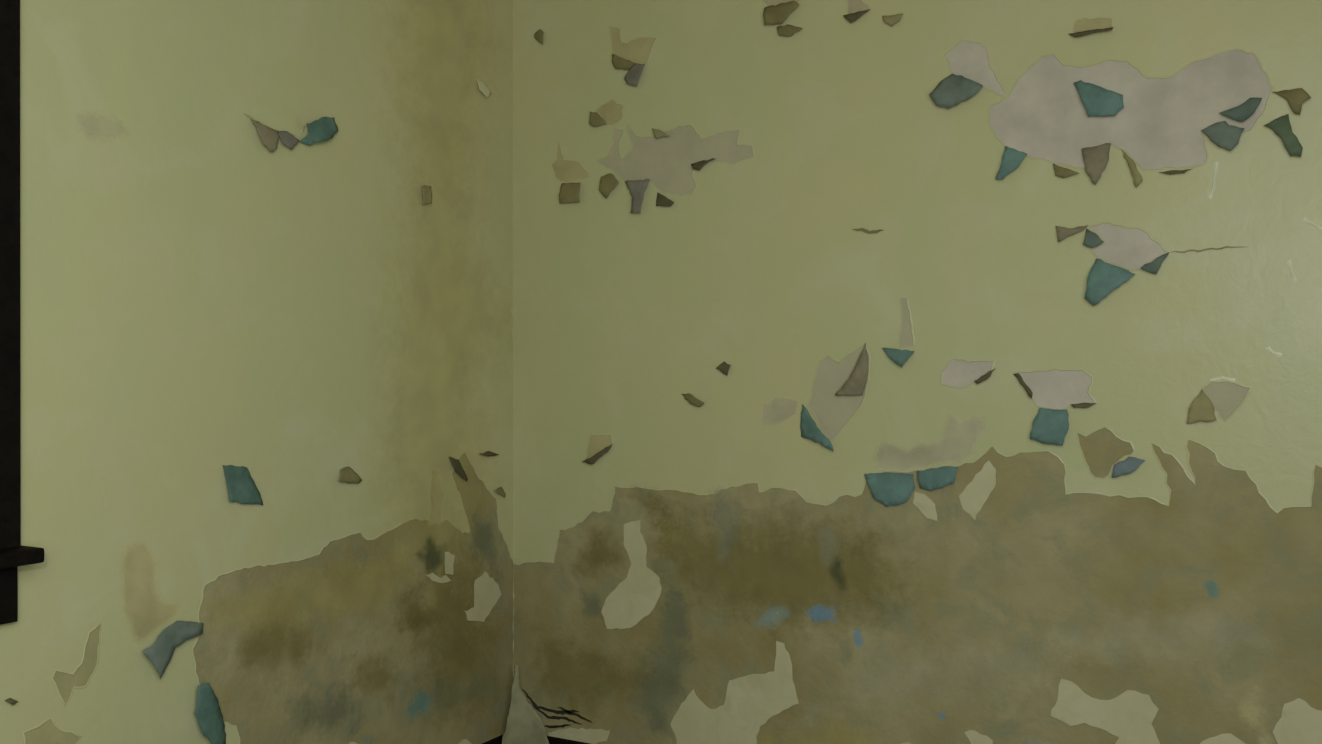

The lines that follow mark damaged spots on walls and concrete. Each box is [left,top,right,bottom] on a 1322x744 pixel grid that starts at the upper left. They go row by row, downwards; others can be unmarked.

peeling [608,26,657,86]
peeling [761,0,803,37]
peeling [242,112,338,152]
peeling [551,99,755,213]
peeling [929,39,1311,187]
peeling [1056,221,1170,305]
peeling [716,361,731,375]
peeling [800,297,915,451]
peeling [125,368,1322,744]
damp [671,529,881,620]
damp [406,541,479,715]
crack [522,689,592,728]